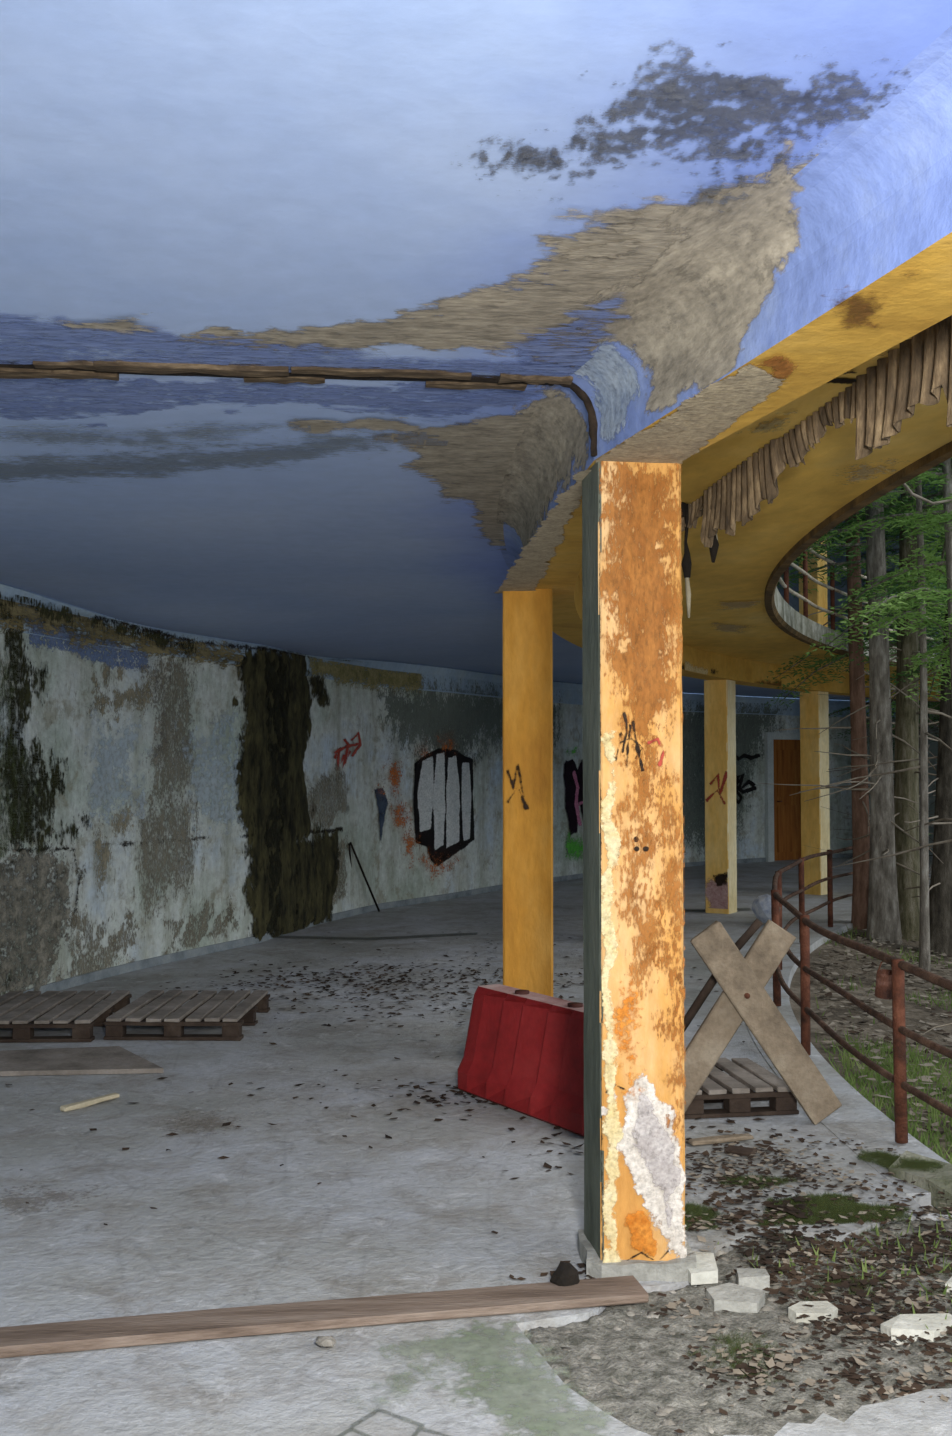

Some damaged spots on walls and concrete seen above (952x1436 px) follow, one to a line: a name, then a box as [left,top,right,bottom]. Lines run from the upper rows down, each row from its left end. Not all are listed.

peeling [0,298,797,593]
damp [0,592,244,923]
corrosion [599,461,686,1139]
peeling [601,731,687,1263]
crack [338,1408,449,1436]
spalling [526,1219,952,1436]